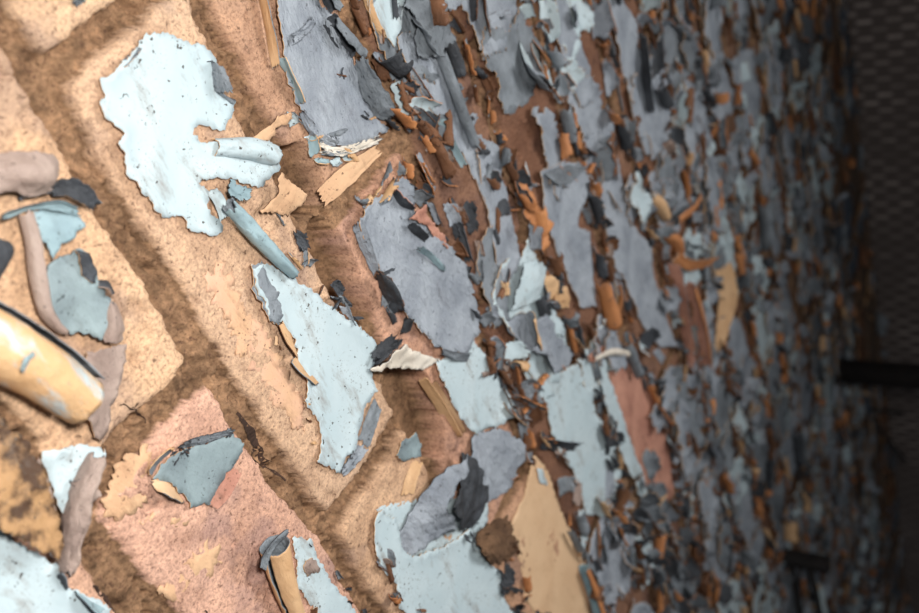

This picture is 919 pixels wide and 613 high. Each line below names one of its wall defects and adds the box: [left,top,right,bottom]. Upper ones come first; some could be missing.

peeling [0,150,244,613]
peeling [99,0,799,613]
peeling [685,0,888,613]